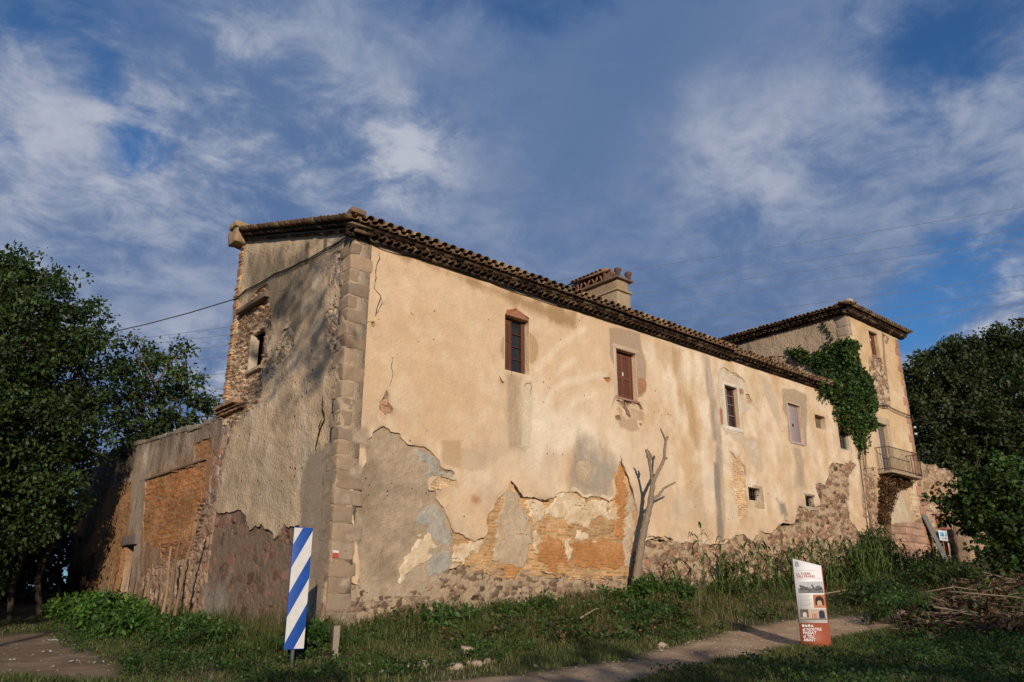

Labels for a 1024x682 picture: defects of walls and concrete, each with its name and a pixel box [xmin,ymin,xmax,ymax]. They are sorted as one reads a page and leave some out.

spalling [83,282,295,614]
crack [367,256,383,323]
peeling [610,328,646,430]
spalling [351,393,932,628]